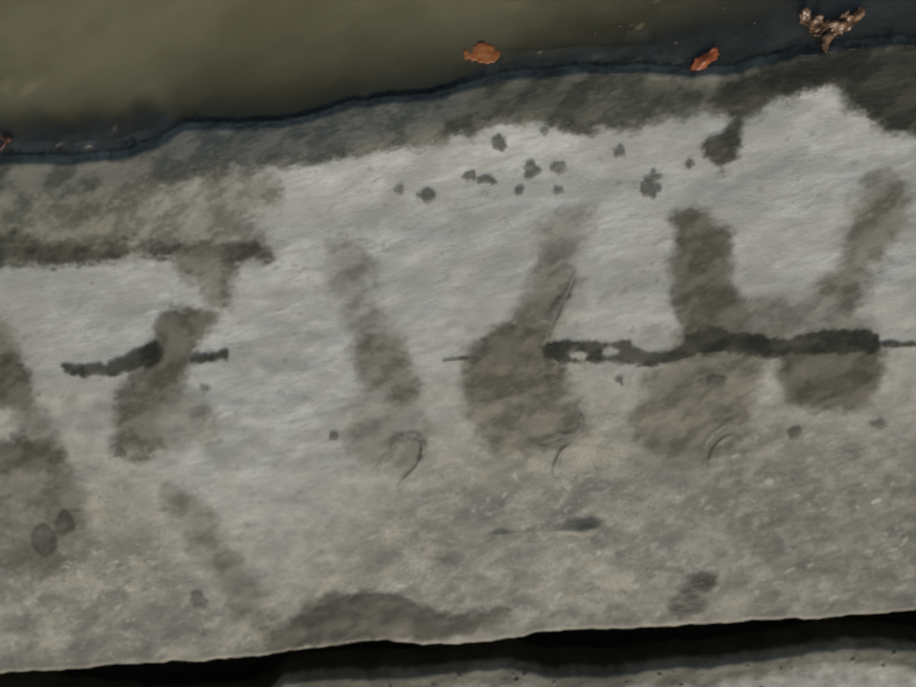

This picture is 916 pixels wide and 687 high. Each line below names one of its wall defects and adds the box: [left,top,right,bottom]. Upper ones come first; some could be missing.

damp [0,39,916,459]
crack [61,342,164,379]
crack [190,349,229,364]
crack [542,326,916,367]
damp [0,421,85,573]